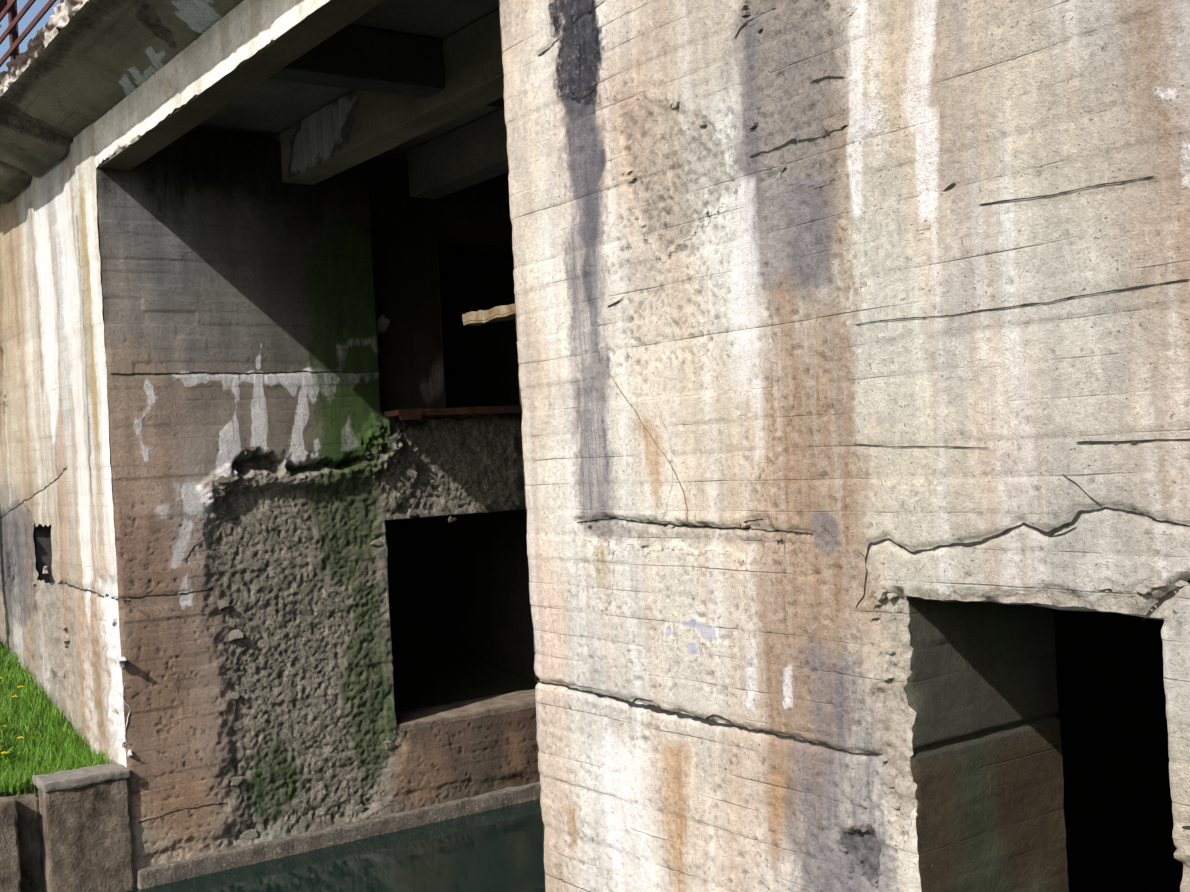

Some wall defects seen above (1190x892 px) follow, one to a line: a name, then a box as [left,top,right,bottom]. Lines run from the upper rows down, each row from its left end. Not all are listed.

rust [0,187,48,448]
water stain [0,0,513,760]
spalling [196,449,391,850]
spalling [385,407,526,522]
water stain [544,0,625,557]
water stain [713,0,813,478]
water stain [825,0,1004,380]
crack [854,442,990,450]
crack [855,474,1190,609]
crack [1076,437,1190,445]
crack [1142,579,1190,621]